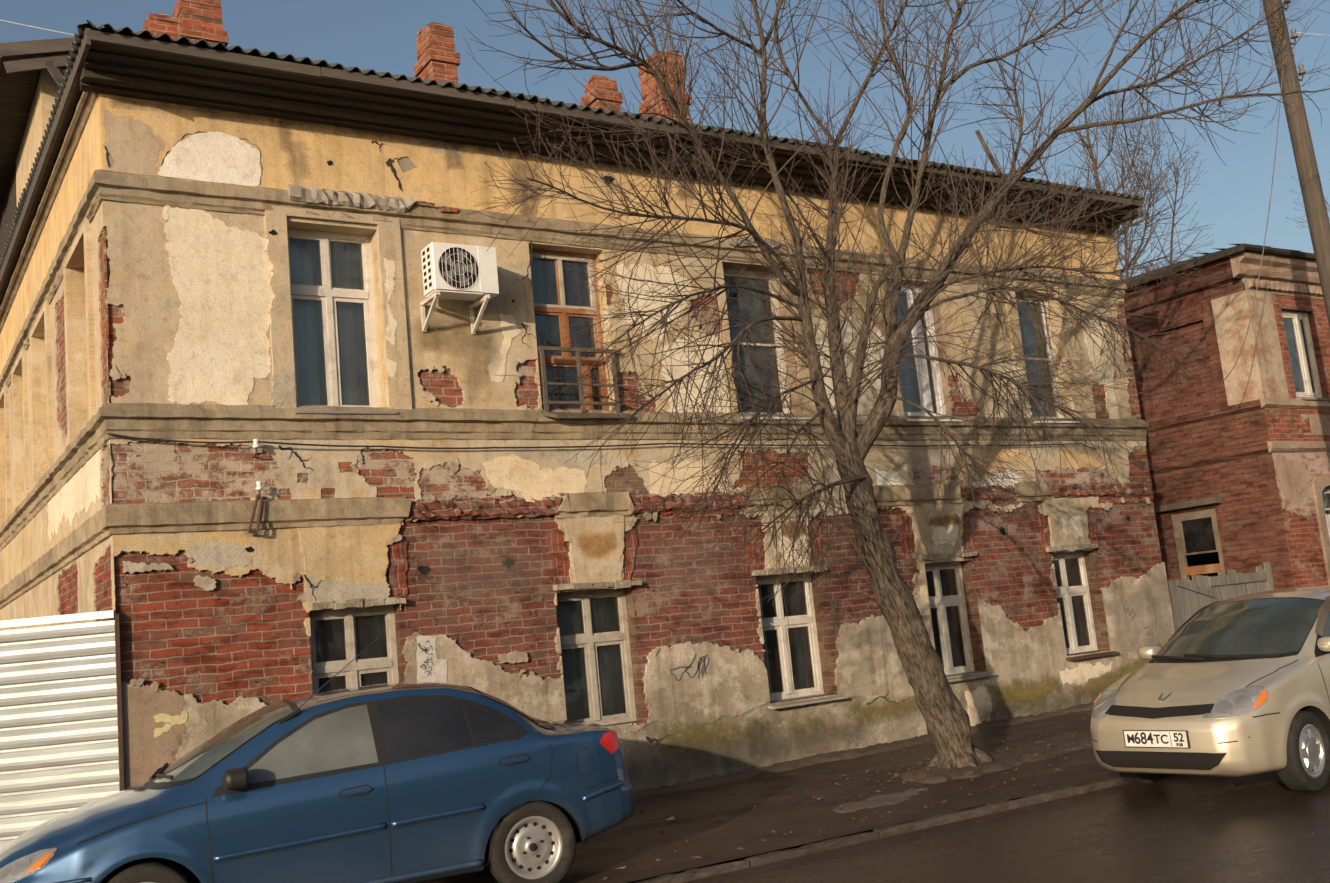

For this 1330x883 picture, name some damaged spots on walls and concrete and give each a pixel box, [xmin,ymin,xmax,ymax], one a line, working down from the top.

peeling [162,206,279,405]
flaking render [418,365,463,408]
flaking render [487,298,539,410]
flaking render [59,565,78,615]
flaking render [94,542,313,705]
flaking render [278,473,335,500]
flaking render [376,484,570,680]
flaking render [617,483,865,763]
flaking render [809,511,883,683]
flaking render [964,499,1058,632]
flaking render [1088,467,1162,589]
damp [627,726,858,781]